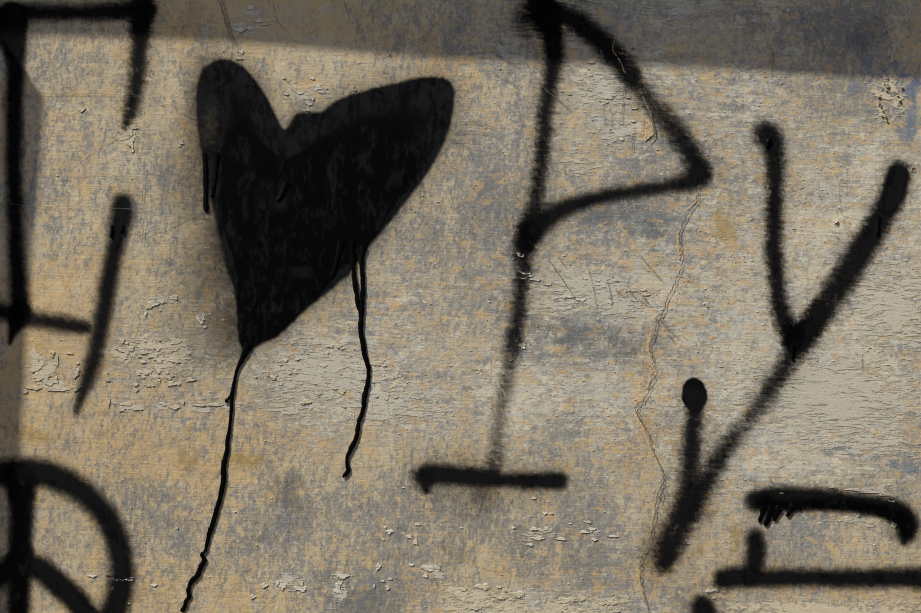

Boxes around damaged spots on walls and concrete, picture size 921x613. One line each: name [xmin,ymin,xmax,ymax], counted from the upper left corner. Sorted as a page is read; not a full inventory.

peeling [144,295,224,328]
peeling [20,347,80,394]
crack [635,158,748,613]